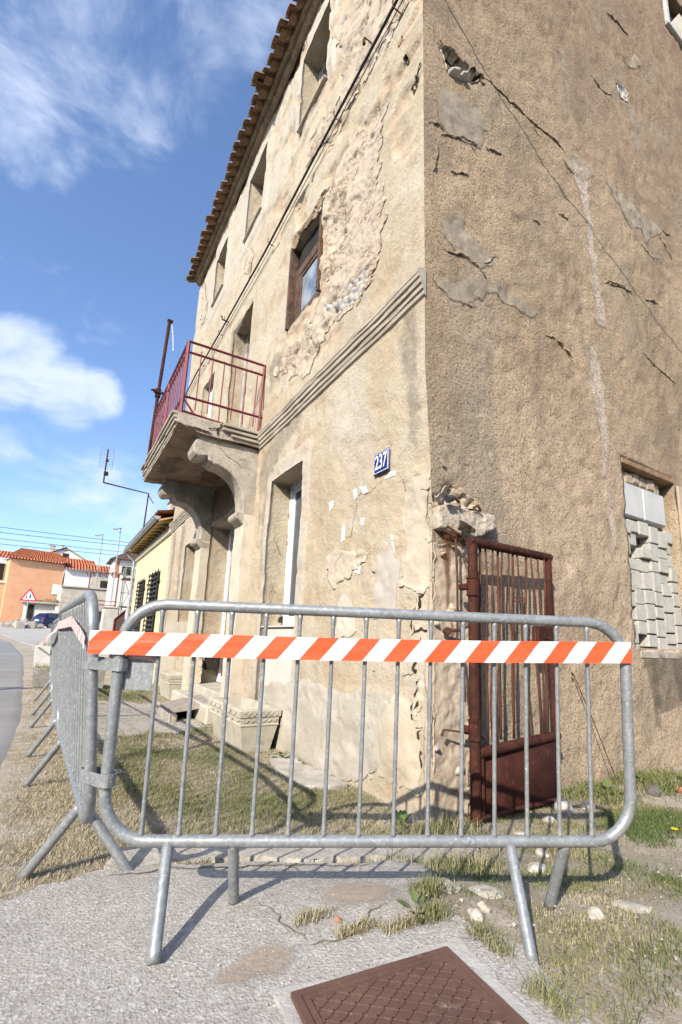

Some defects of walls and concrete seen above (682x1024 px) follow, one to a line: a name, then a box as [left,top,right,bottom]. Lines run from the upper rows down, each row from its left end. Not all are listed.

crack [605,9,628,36]
flaking render [429,38,502,155]
crack [438,42,569,159]
crack [431,131,478,178]
spalling [273,92,391,381]
crack [449,247,496,279]
flaking render [433,212,536,317]
damp [572,163,606,327]
crack [604,276,658,304]
crack [545,331,573,359]
spalling [325,525,376,590]
flaking render [391,470,481,640]